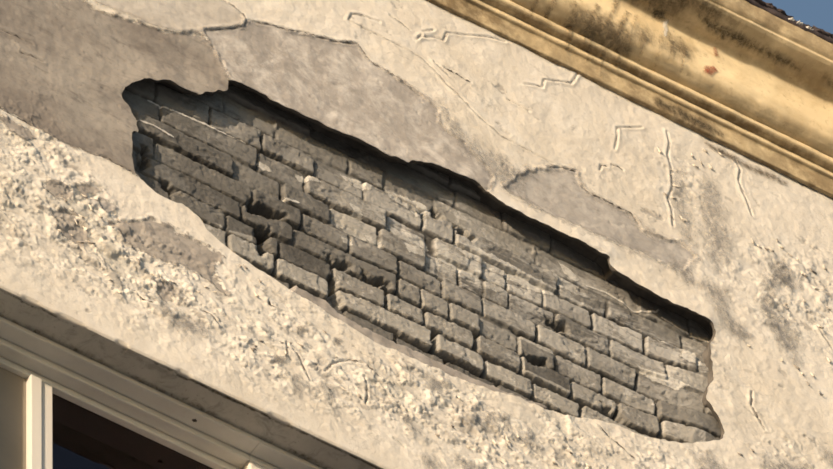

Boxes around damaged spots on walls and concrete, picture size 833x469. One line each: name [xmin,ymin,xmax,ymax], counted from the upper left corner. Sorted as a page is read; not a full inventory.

peeling [0,0,493,189]
crack [206,4,576,172]
leakage [566,1,647,66]
leakage [657,100,722,134]
leakage [649,0,793,67]
leakage [706,143,785,184]
peeling [41,179,231,296]
spalling [122,78,725,443]